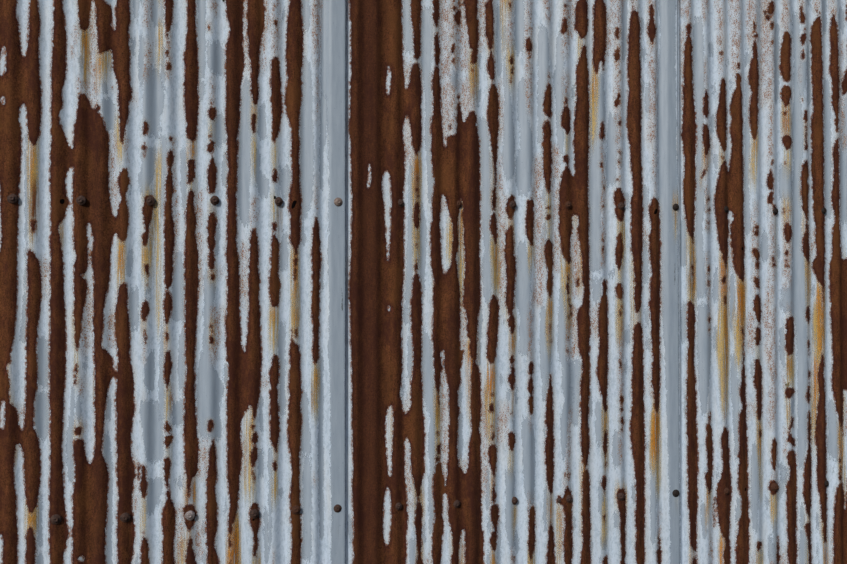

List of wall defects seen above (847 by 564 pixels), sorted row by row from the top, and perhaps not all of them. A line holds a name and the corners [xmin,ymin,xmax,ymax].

rust [140,0,323,564]
peeling [208,78,269,228]
peeling [278,0,353,564]
peeling [402,0,435,325]
peeling [401,328,436,564]
rust [348,0,517,564]
peeling [477,117,492,365]
rust [523,0,662,564]
peeling [588,74,623,306]
peeling [641,0,740,564]
rust [675,0,847,564]
peeling [735,13,817,532]